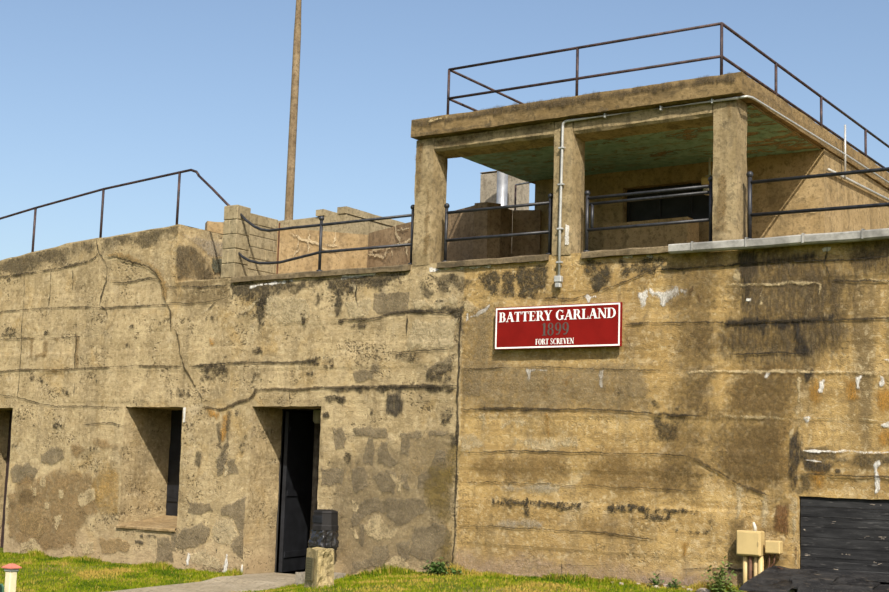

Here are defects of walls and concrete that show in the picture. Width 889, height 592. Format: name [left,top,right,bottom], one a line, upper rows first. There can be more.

crack [293,232,339,255]
crack [369,226,411,259]
water stain [420,265,491,298]
water stain [638,287,687,306]
crack [540,251,889,300]
water stain [410,304,655,406]
crack [625,317,889,366]
water stain [720,248,855,422]
crack [0,240,768,568]
water stain [654,417,685,439]
water stain [788,425,889,533]
crack [689,566,754,574]